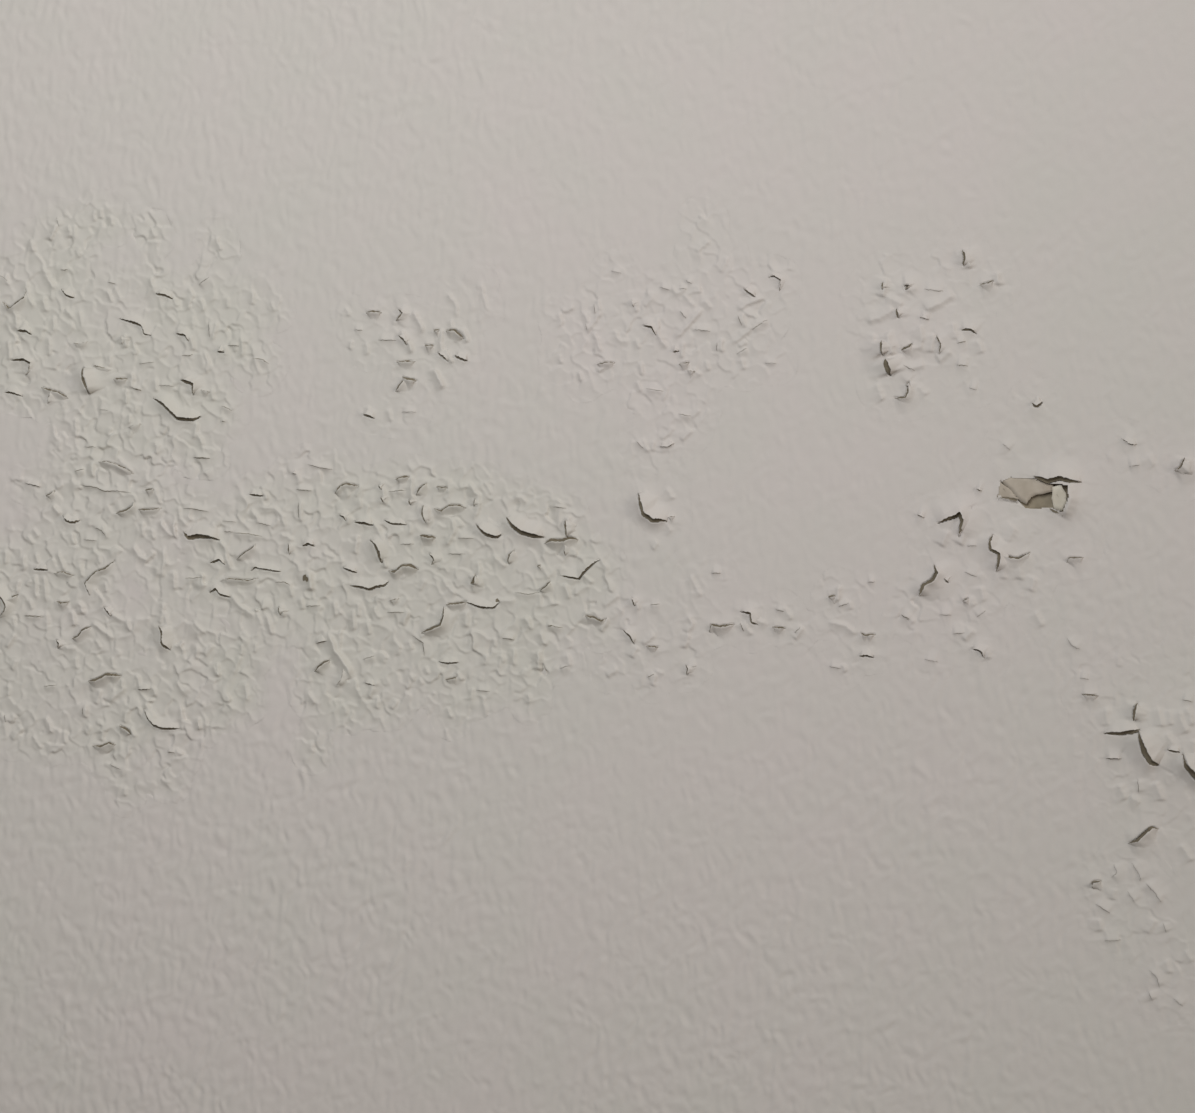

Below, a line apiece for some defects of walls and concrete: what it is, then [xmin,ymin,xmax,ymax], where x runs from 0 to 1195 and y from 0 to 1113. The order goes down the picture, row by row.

peeling [0,186,693,818]
peeling [887,445,1195,883]